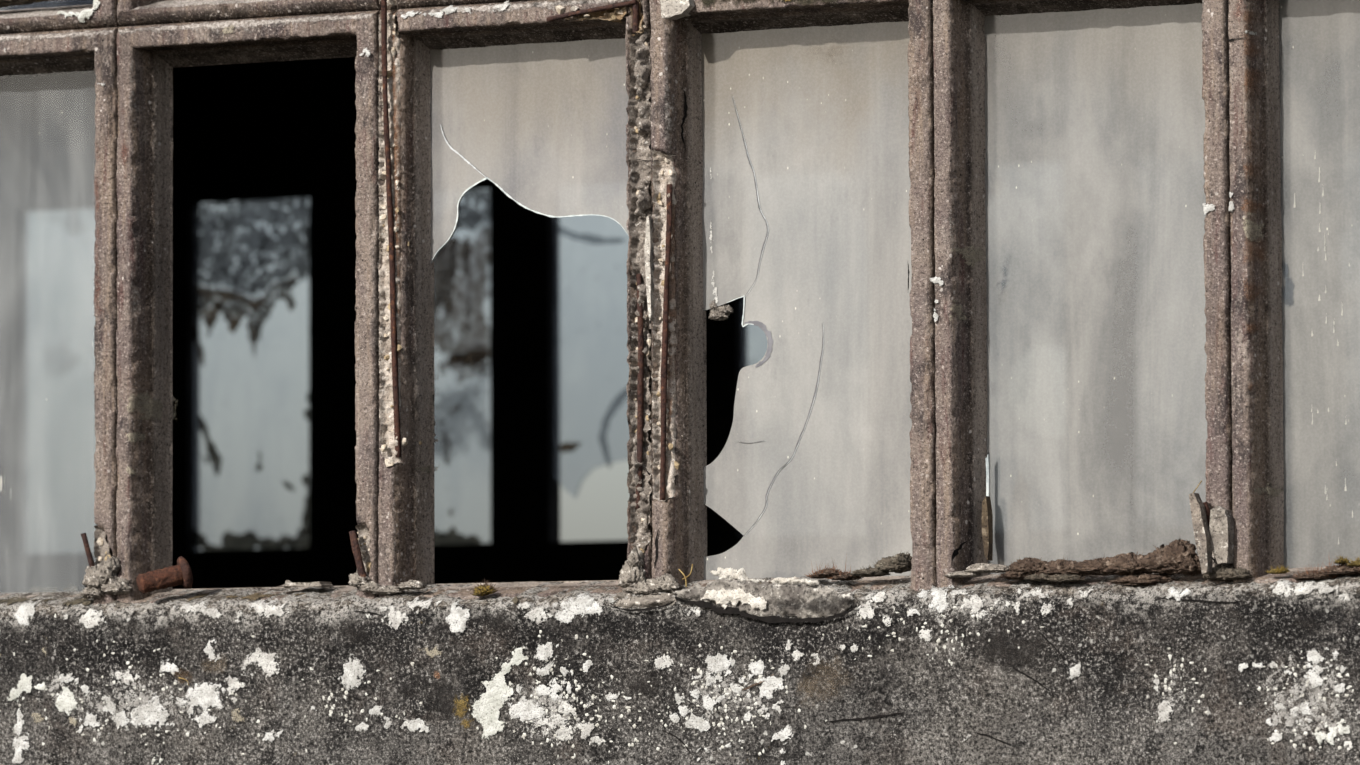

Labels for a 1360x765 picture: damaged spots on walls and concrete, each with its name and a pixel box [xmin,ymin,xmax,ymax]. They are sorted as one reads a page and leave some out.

spalling [547,0,688,555]